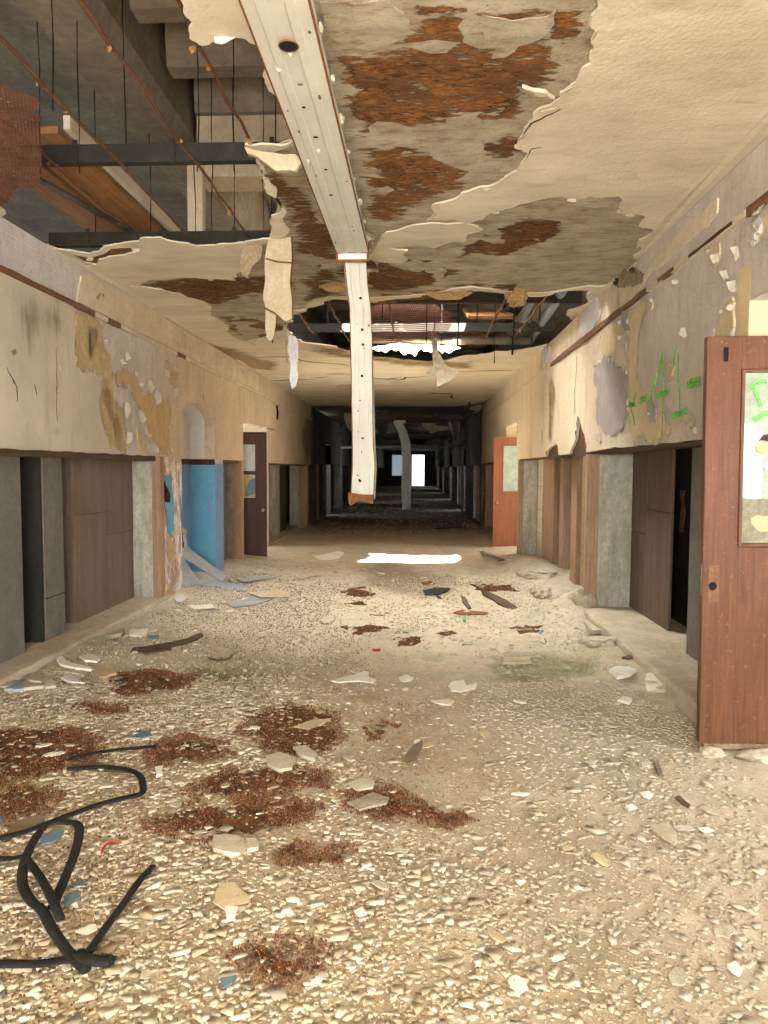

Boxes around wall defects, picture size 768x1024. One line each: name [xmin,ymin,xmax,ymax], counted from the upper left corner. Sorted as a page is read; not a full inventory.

spalling [134,244,287,342]
spalling [260,139,347,310]
spalling [313,0,721,446]